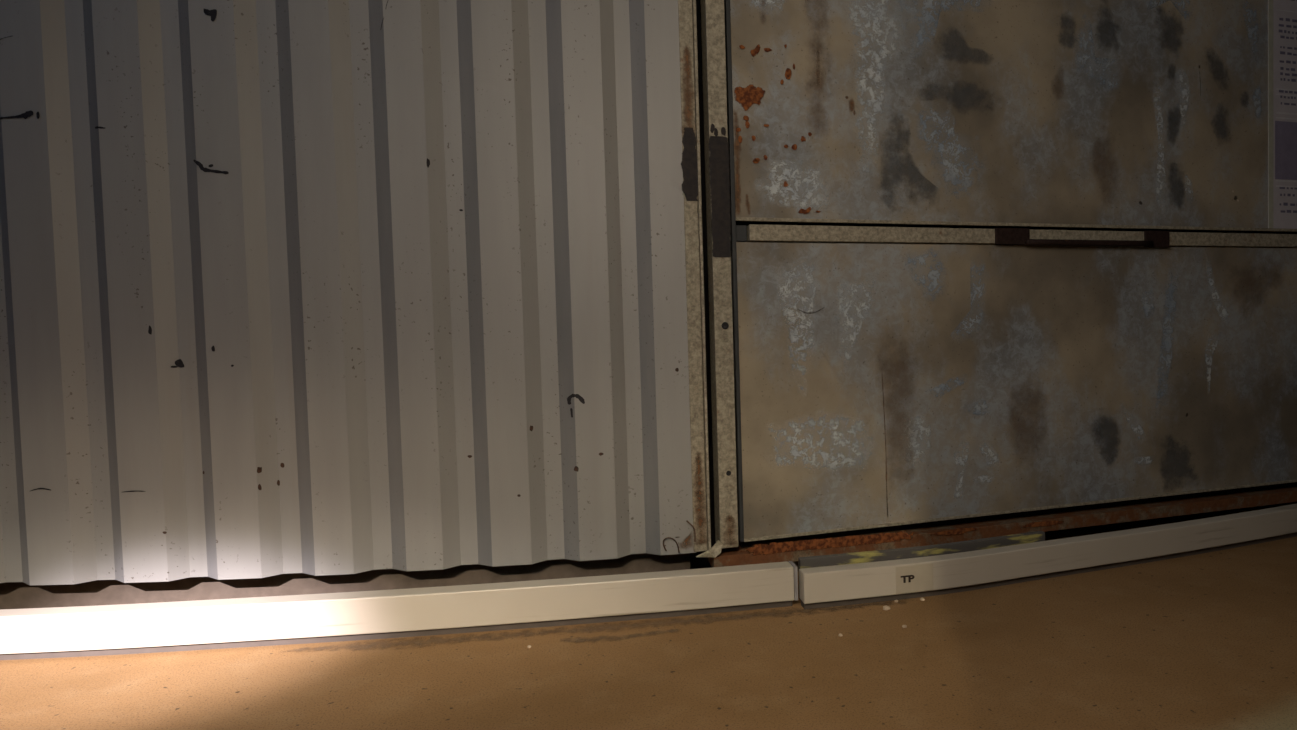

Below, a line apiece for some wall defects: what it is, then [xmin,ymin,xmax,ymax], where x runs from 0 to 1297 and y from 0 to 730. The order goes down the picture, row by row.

corrosion [739,44,787,56]
corrosion [734,85,769,212]
water stain [882,119,935,198]
corrosion [726,516,914,556]